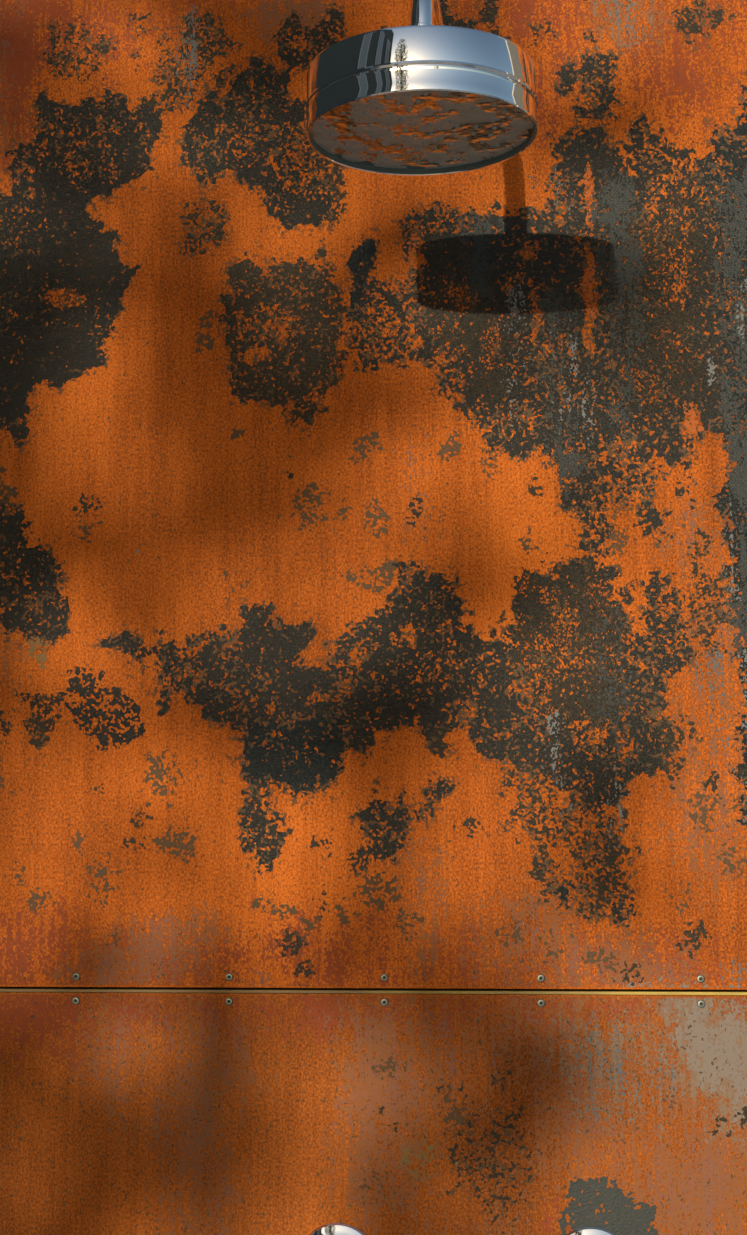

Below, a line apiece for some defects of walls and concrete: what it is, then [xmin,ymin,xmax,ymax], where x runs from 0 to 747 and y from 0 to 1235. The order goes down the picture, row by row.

corrosion [578,168,599,226]
corrosion [580,258,603,327]
corrosion [682,401,705,439]